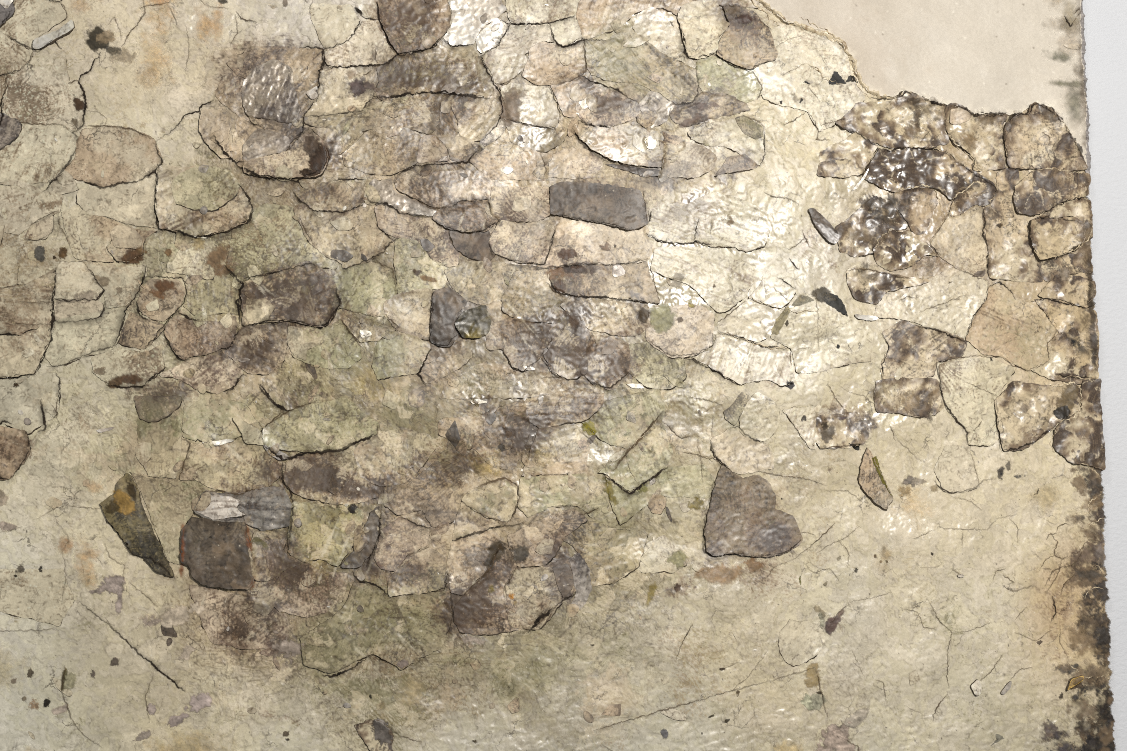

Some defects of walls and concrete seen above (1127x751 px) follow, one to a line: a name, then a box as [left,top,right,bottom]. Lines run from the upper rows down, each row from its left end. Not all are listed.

crack [0,268,198,479]
crack [0,16,500,350]
peeling [0,0,791,481]
crack [299,5,635,174]
peeling [100,21,1106,673]
crack [653,22,1095,451]
leakage [853,193,918,244]
leakage [904,98,936,139]
leakage [1071,181,1099,365]
peeling [0,568,74,627]
leakage [1042,448,1115,751]
peeling [354,703,394,751]